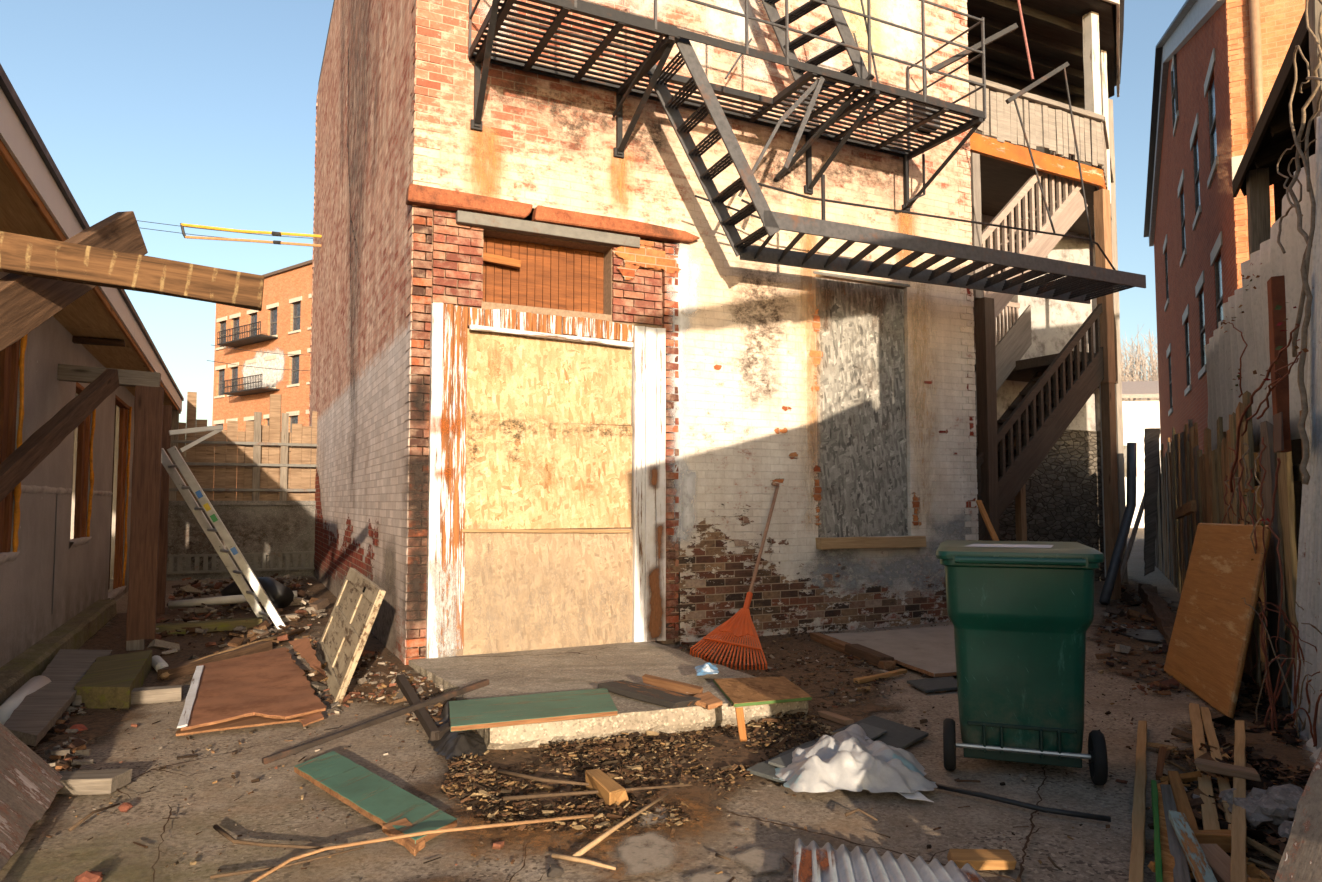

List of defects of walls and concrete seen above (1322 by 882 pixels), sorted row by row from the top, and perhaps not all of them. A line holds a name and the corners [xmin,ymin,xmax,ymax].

water stain [735,273,784,374]
corrosion [432,418,458,433]
peeling [314,469,378,581]
peeling [650,467,658,488]
peeling [647,504,951,643]